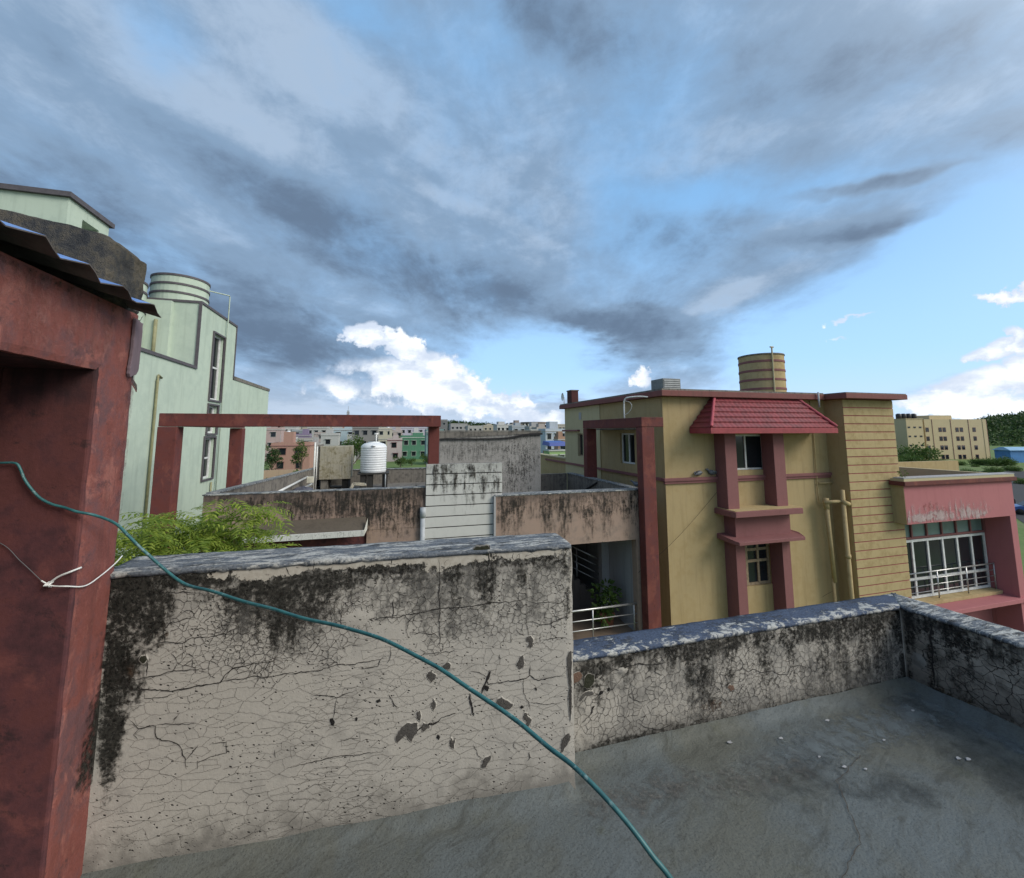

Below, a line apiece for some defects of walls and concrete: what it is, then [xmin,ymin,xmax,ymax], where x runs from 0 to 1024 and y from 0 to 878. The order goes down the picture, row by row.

damp [241,438,639,537]
peeling [908,503,987,523]
damp [74,552,571,793]
spalling [426,661,452,683]
spalling [515,635,534,670]
spalling [394,698,456,749]
spalling [484,685,532,727]
crack [88,545,1024,858]
damp [575,610,1024,814]
spalling [480,754,492,769]